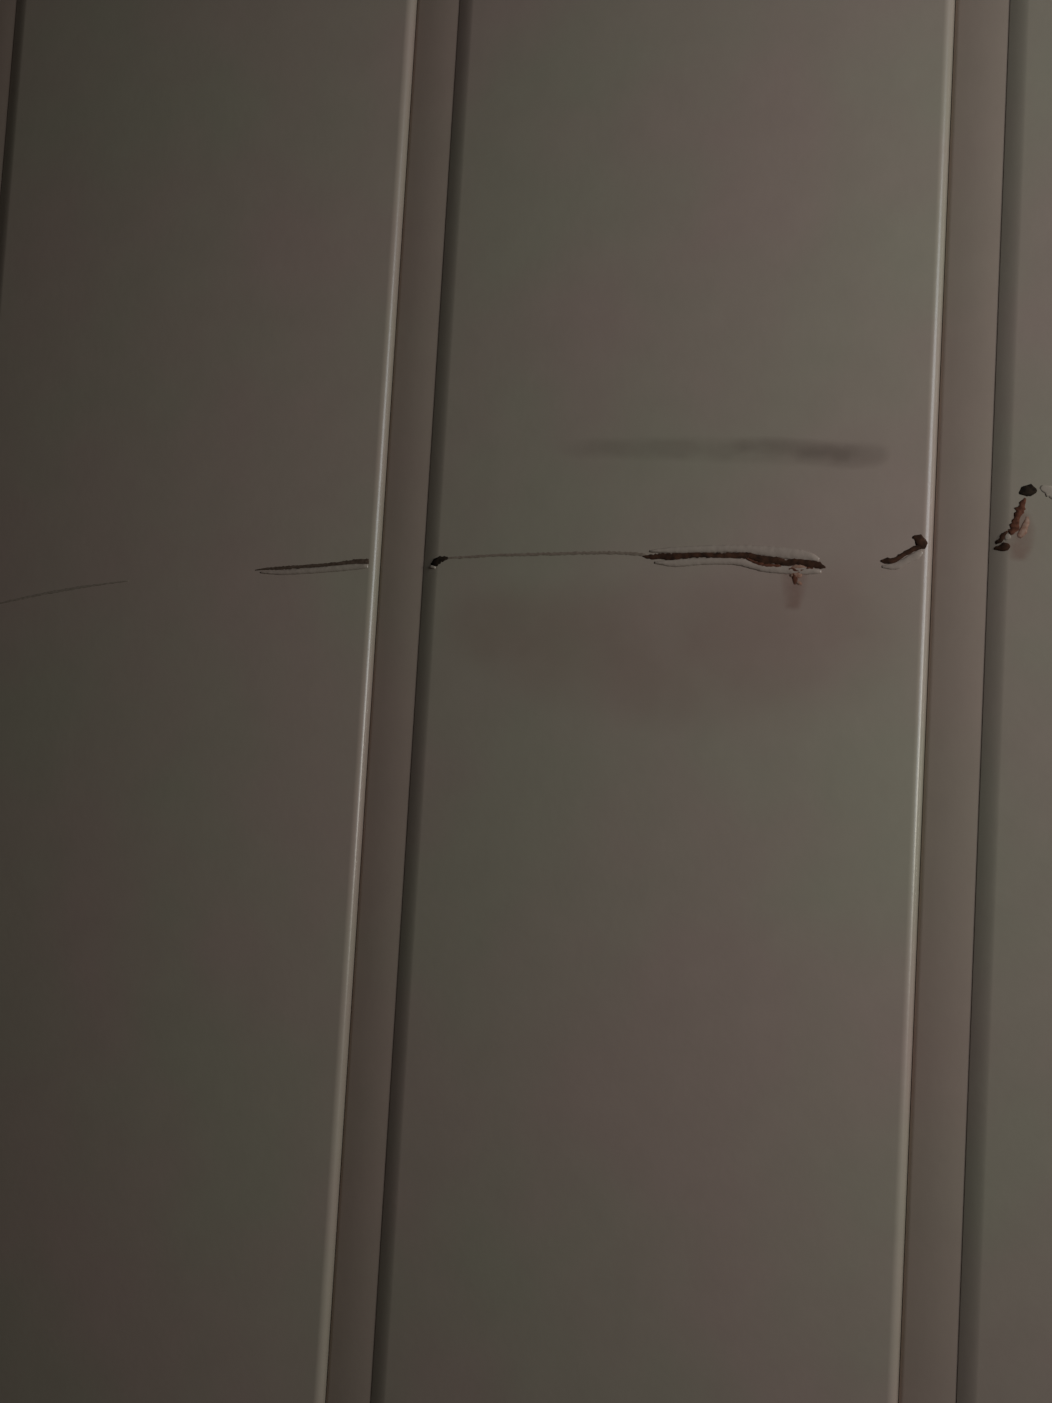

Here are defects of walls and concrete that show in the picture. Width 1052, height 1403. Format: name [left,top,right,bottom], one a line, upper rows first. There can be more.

crack [255,559,369,575]
crack [429,545,826,585]
crack [880,534,928,570]